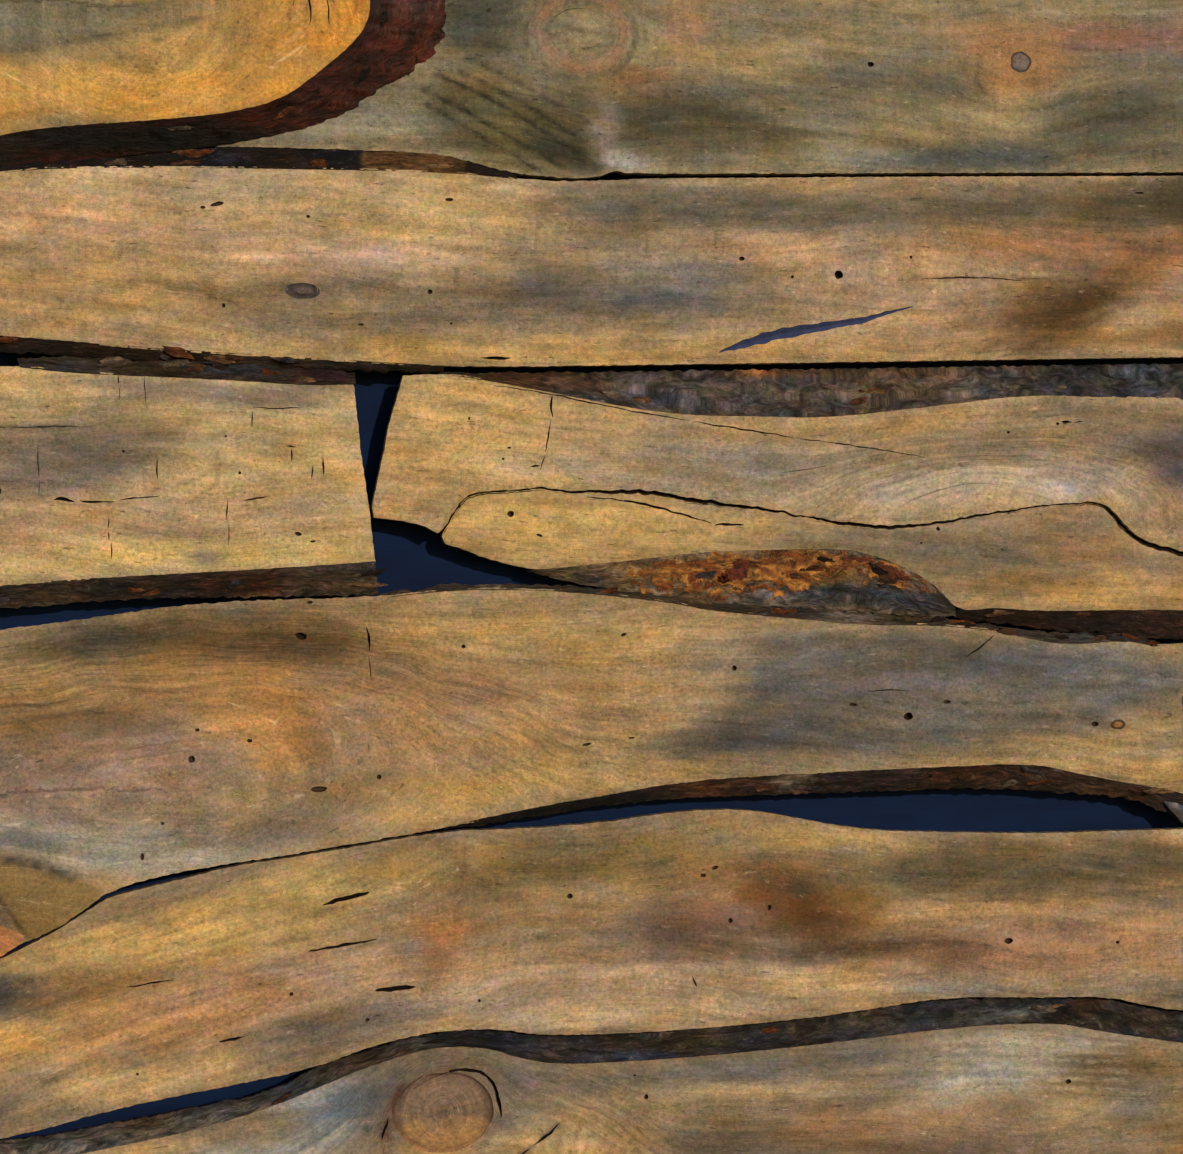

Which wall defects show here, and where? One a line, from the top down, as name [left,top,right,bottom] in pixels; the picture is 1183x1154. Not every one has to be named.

crack [925,274,1019,282]
crack [719,306,913,353]
crack [441,356,1183,556]